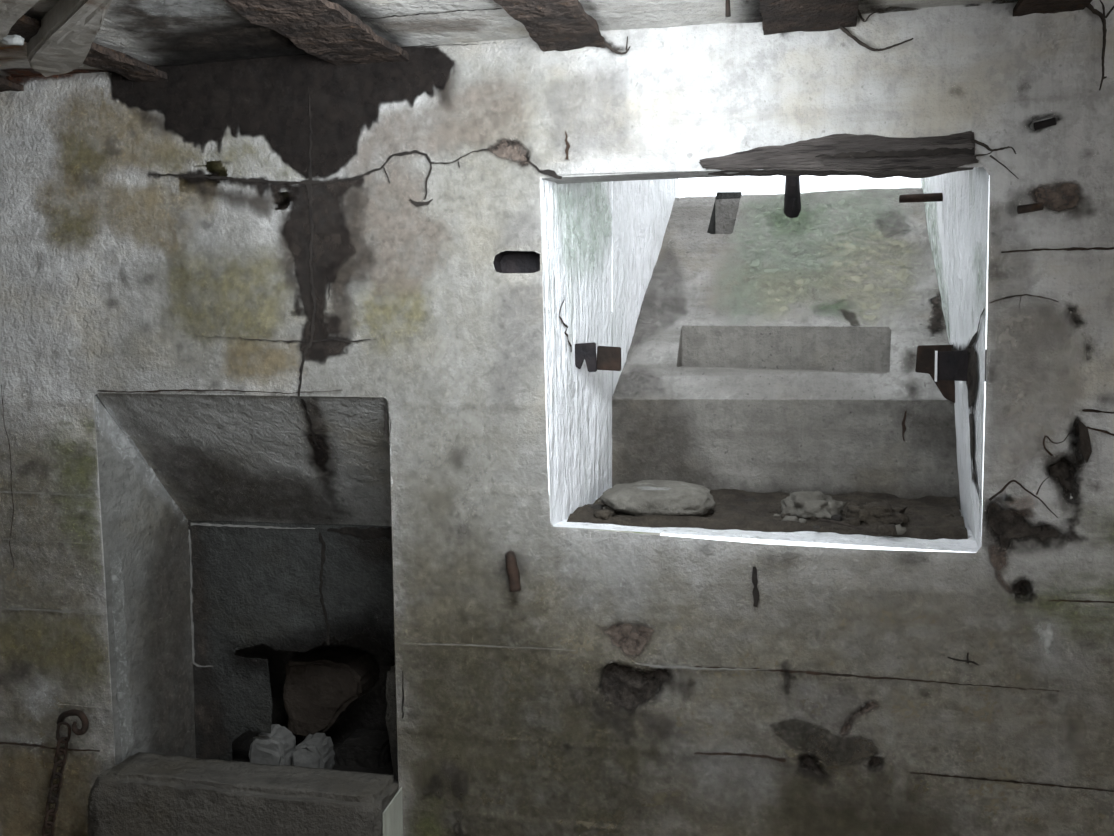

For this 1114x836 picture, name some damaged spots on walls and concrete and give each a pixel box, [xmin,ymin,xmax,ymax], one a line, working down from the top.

damp [64,45,455,181]
damp [427,79,534,149]
crack [529,131,570,179]
crack [97,86,489,446]
damp [137,164,1114,836]
spalling [951,341,1092,593]
spalling [575,623,694,736]
peeling [770,701,888,836]